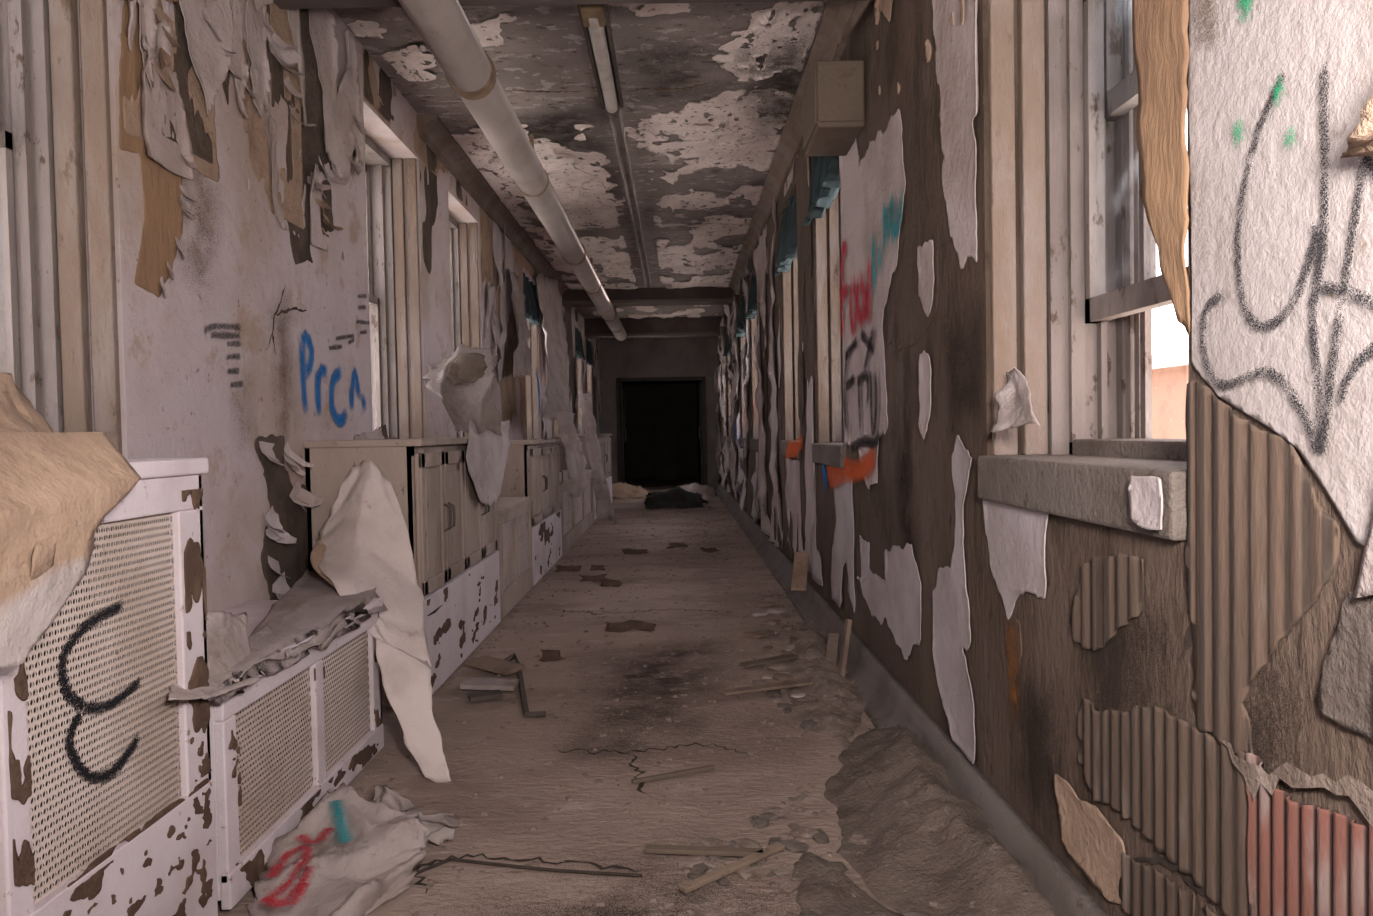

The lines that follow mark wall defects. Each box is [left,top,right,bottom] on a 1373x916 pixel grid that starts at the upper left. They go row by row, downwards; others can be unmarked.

peeling [119,0,437,299]
peeling [254,434,324,600]
peeling [354,424,388,440]
peeling [413,0,979,764]
peeling [983,499,1049,620]
peeling [1053,0,1373,916]
spalling [8,663,32,805]
spalling [228,730,242,806]
spalling [13,839,35,887]
spalling [235,849,267,886]